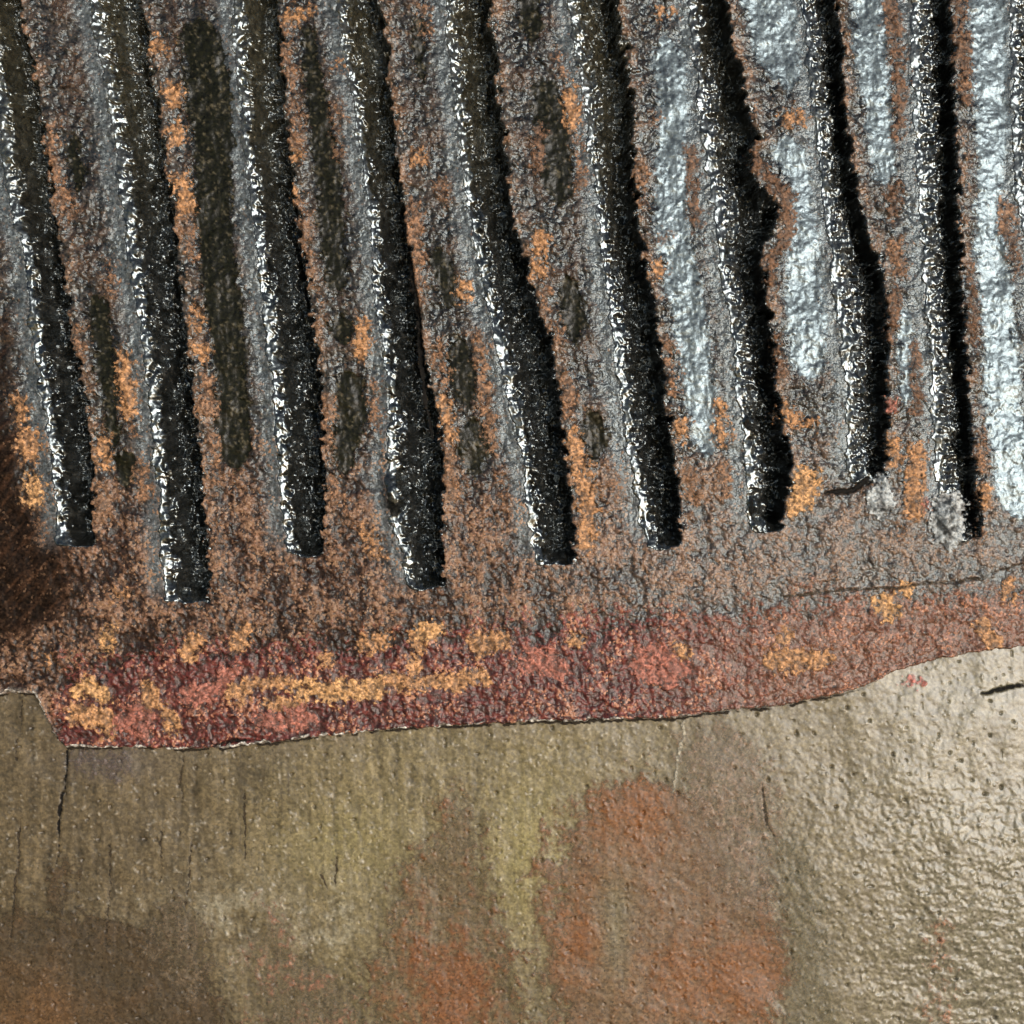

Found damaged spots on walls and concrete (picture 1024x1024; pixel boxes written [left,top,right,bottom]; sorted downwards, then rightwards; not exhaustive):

corrosion [165,169,201,264]
corrosion [8,392,49,547]
corrosion [113,346,142,438]
corrosion [430,337,469,501]
corrosion [557,370,631,556]
corrosion [786,464,823,520]
corrosion [885,431,933,543]
peeling [0,576,1024,750]
crack [981,684,1024,695]
crack [56,690,859,864]
crack [184,844,193,907]
corrosion [357,721,796,1024]